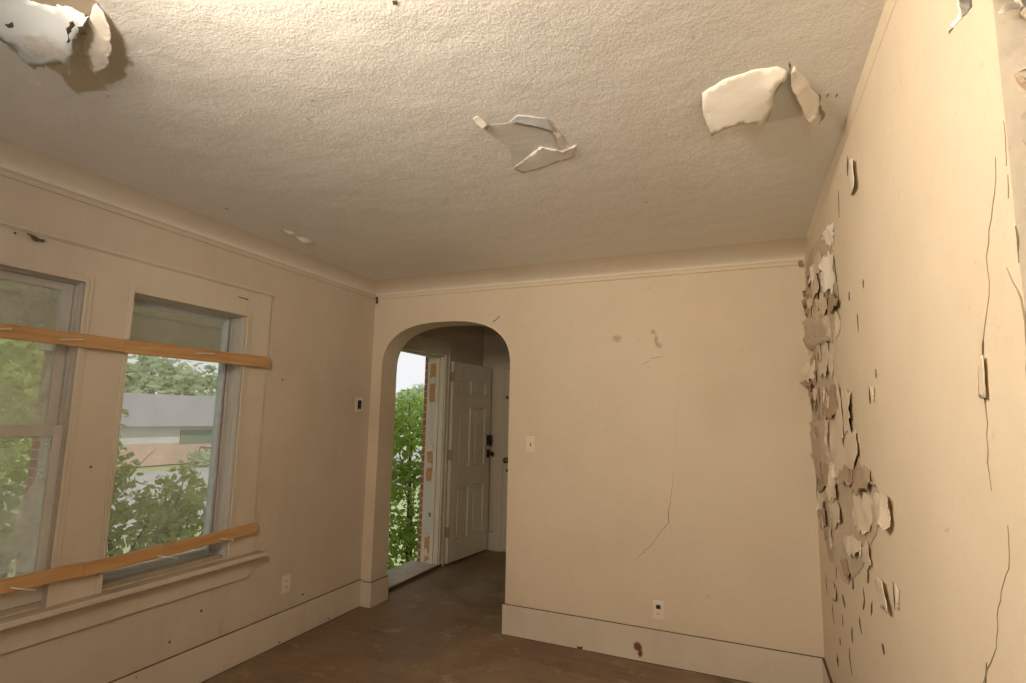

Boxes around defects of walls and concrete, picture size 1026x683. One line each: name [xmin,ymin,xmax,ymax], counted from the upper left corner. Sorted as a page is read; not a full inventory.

peeling [0,0,112,76]
peeling [948,0,972,34]
peeling [998,0,1026,19]
peeling [702,62,838,137]
peeling [473,115,577,173]
peeling [798,223,899,674]
crack [983,525,1010,683]